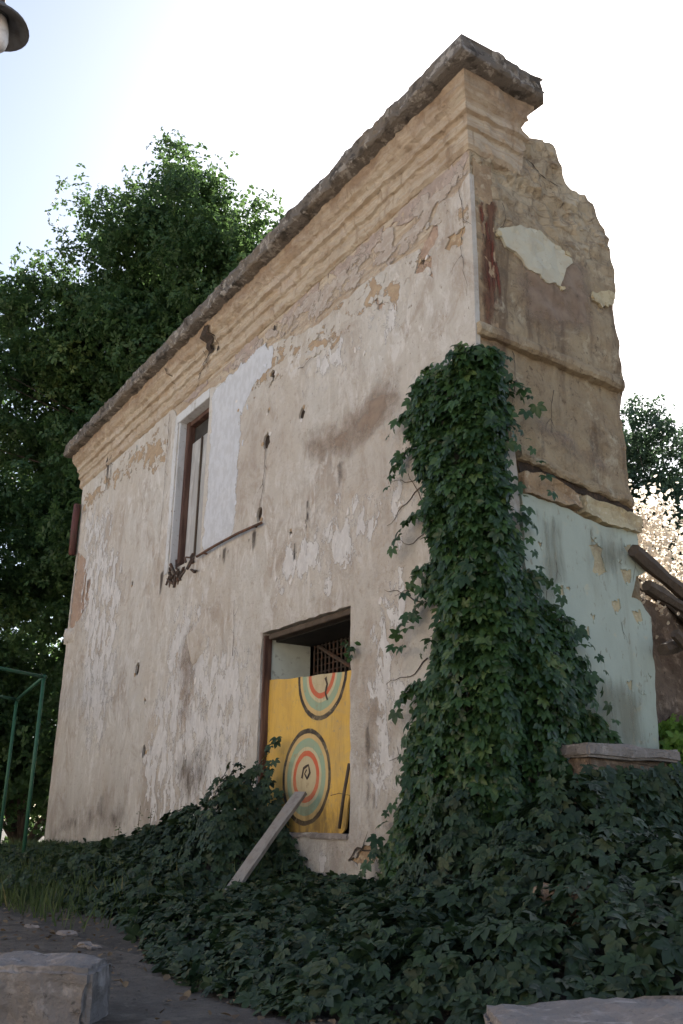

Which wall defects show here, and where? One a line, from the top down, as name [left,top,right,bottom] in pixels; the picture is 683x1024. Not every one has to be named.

corrosion [479,201,501,325]
flaking render [173,150,470,550]
water stain [311,393,394,453]
peeling [274,473,415,608]
peeling [356,566,409,807]